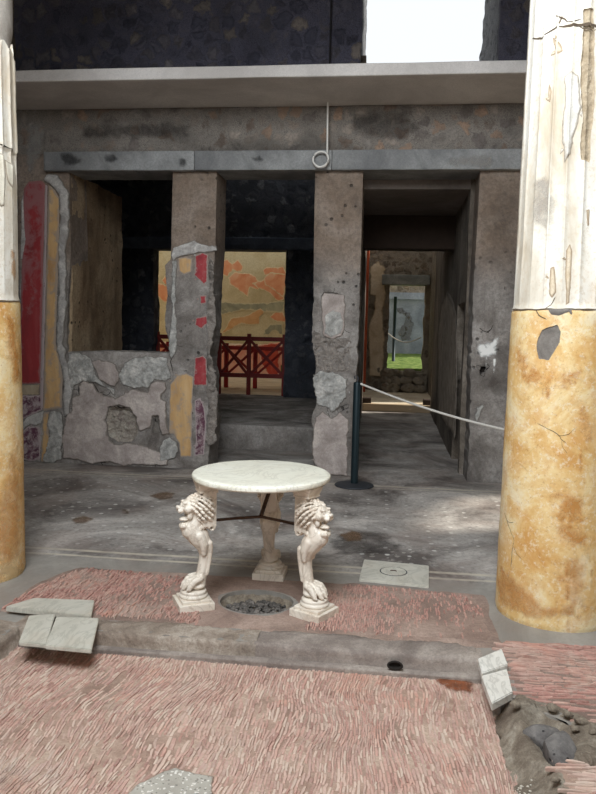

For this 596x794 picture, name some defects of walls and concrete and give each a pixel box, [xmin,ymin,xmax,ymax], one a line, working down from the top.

crack [532,15,596,40]
spalling [560,8,595,162]
flaking render [0,153,13,206]
flaking render [57,352,171,467]